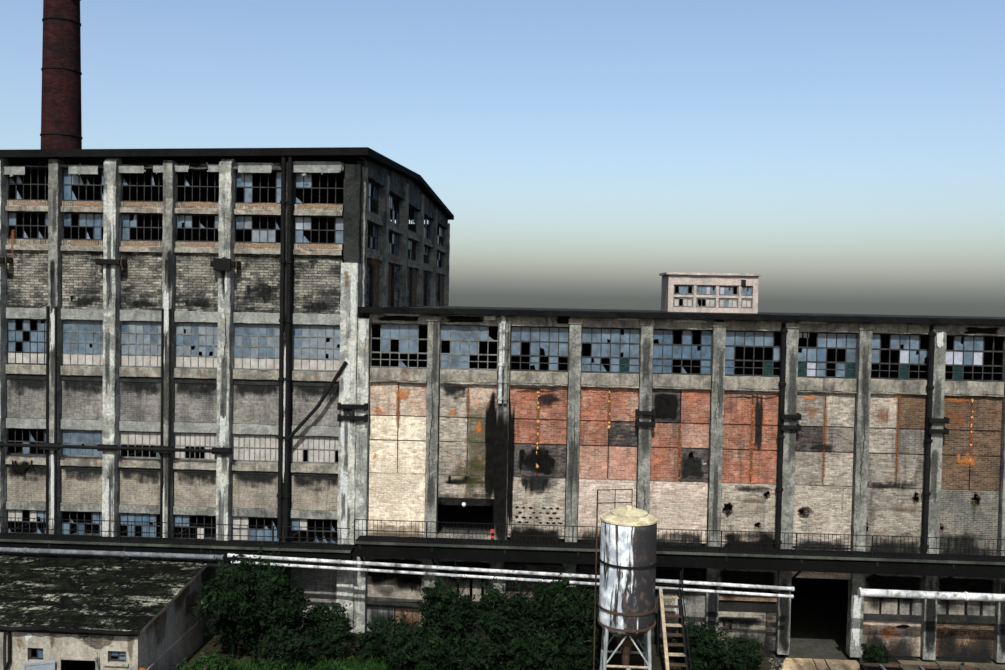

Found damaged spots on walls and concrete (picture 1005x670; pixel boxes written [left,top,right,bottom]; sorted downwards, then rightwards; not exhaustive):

leakage [539,394,559,406]
leakage [510,449,548,502]